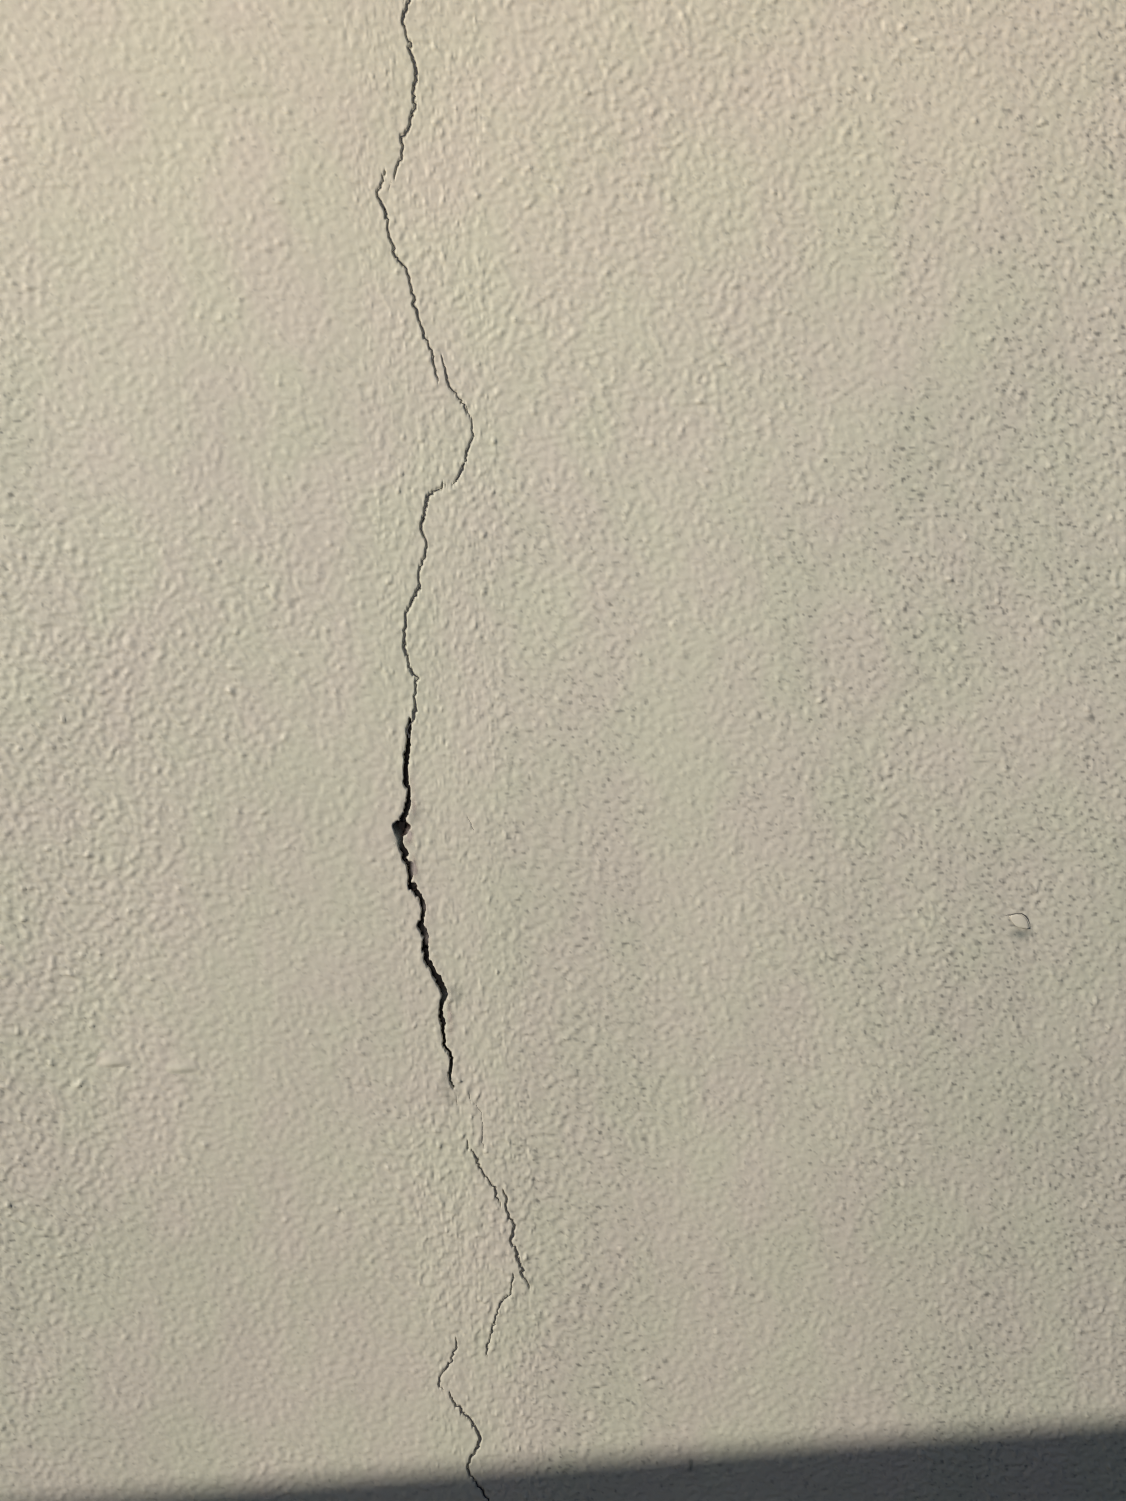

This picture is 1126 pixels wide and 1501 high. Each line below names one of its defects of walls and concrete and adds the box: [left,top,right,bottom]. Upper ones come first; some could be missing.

crack [377,0,529,1501]